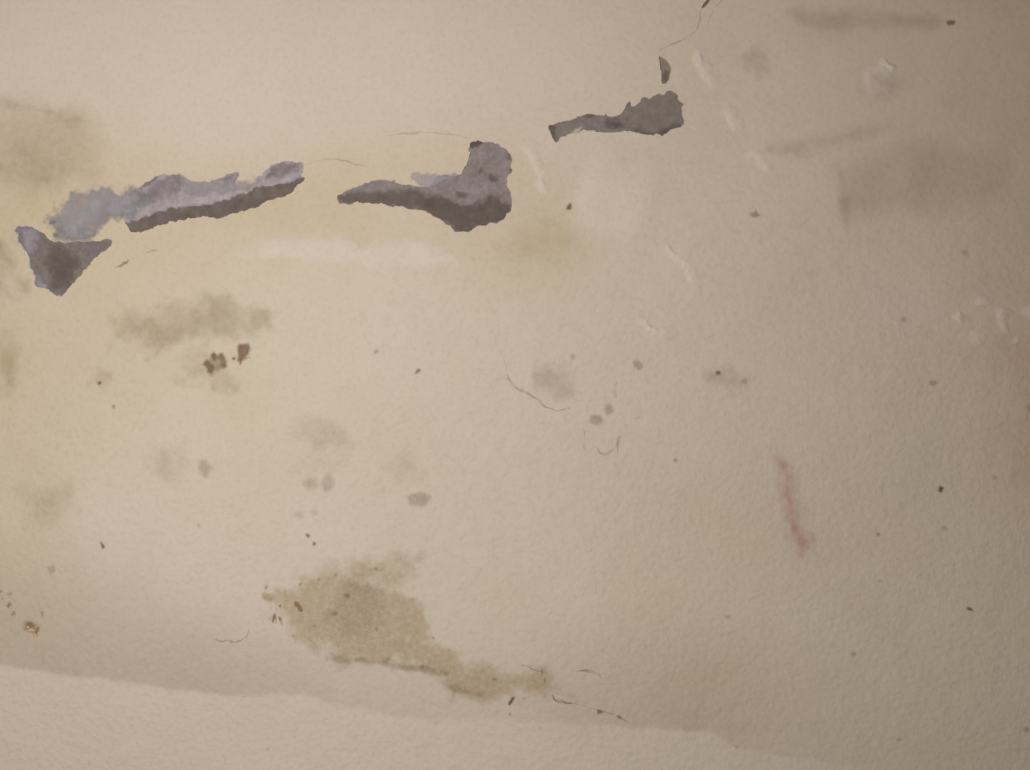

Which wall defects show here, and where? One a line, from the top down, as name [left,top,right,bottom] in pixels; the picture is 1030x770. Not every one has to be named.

peeling [548,56,685,143]
peeling [14,161,305,297]
peeling [337,140,513,232]